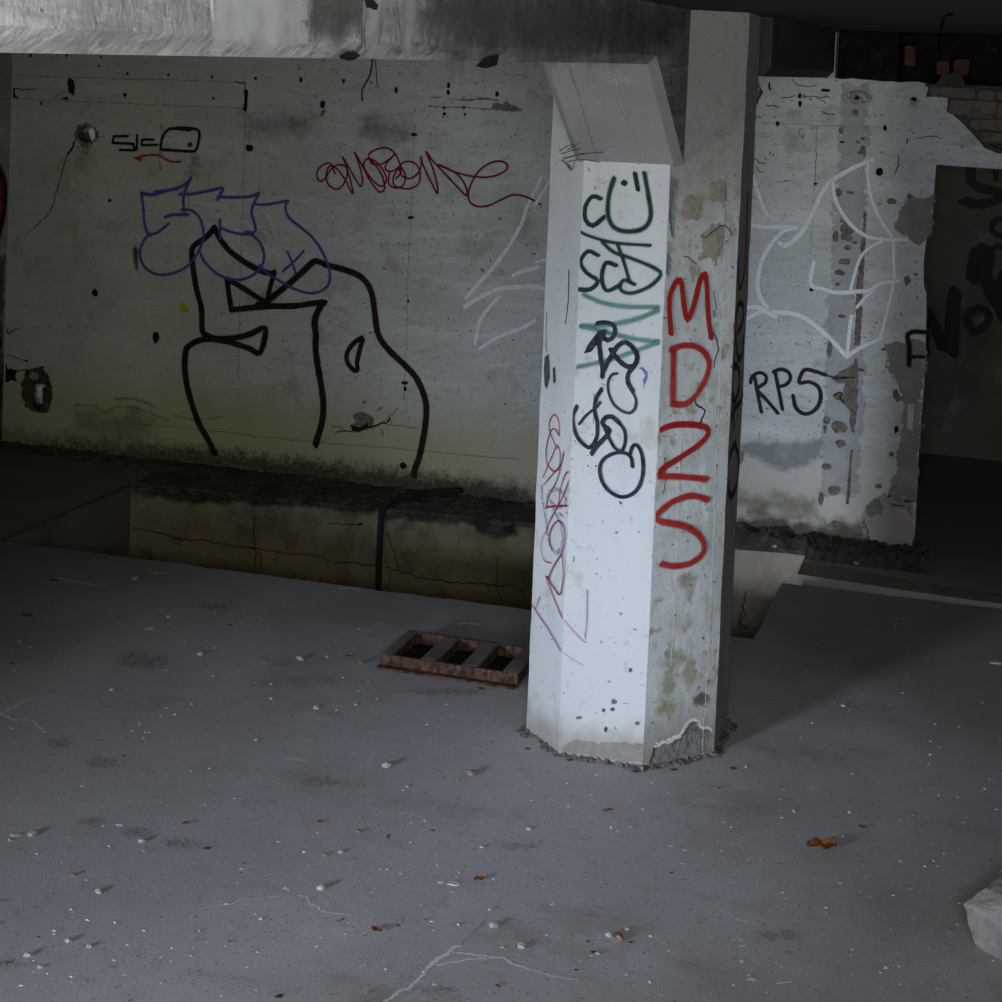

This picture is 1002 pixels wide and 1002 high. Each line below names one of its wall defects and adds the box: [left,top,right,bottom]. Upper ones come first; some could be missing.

spalling [669,176,727,237]
spalling [698,223,725,266]
flaking render [887,186,936,245]
spalling [5,365,53,414]
spalling [332,401,413,435]
leakage [28,435,515,498]
spalling [562,722,713,764]
crack [382,922,577,1002]